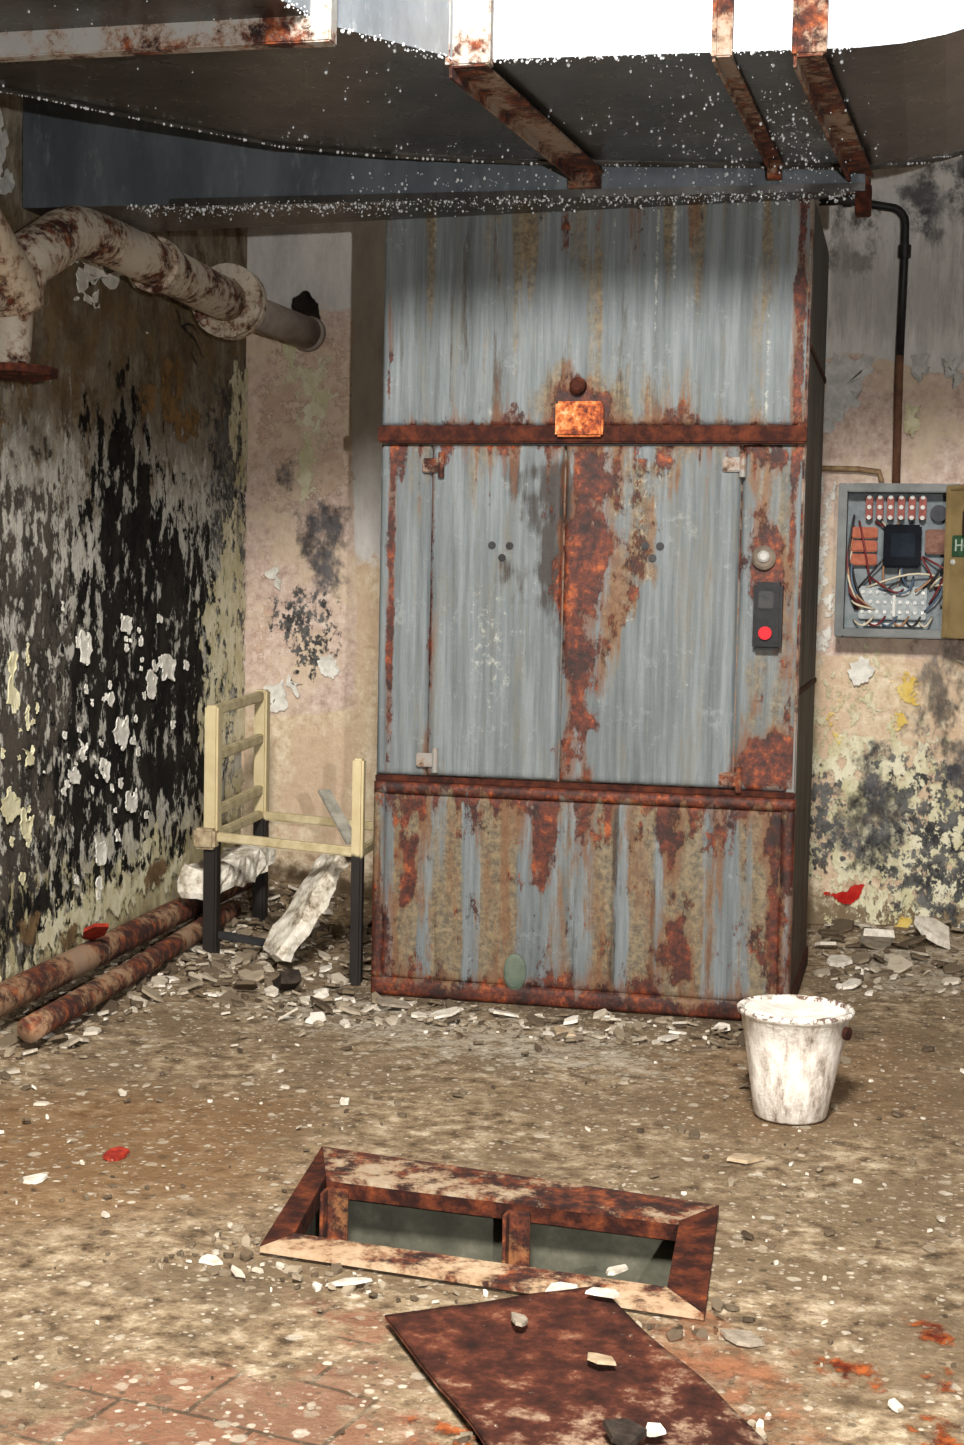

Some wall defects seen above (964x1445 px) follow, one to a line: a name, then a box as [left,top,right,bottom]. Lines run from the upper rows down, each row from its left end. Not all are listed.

water stain [900,155,964,244]
peeling [823,352,883,433]
peeling [891,399,921,437]
water stain [0,261,247,981]
water stain [269,502,345,682]
water stain [809,639,964,928]
corrosion [144,857,168,893]
corrosion [59,922,78,952]
corrosion [670,1314,774,1418]